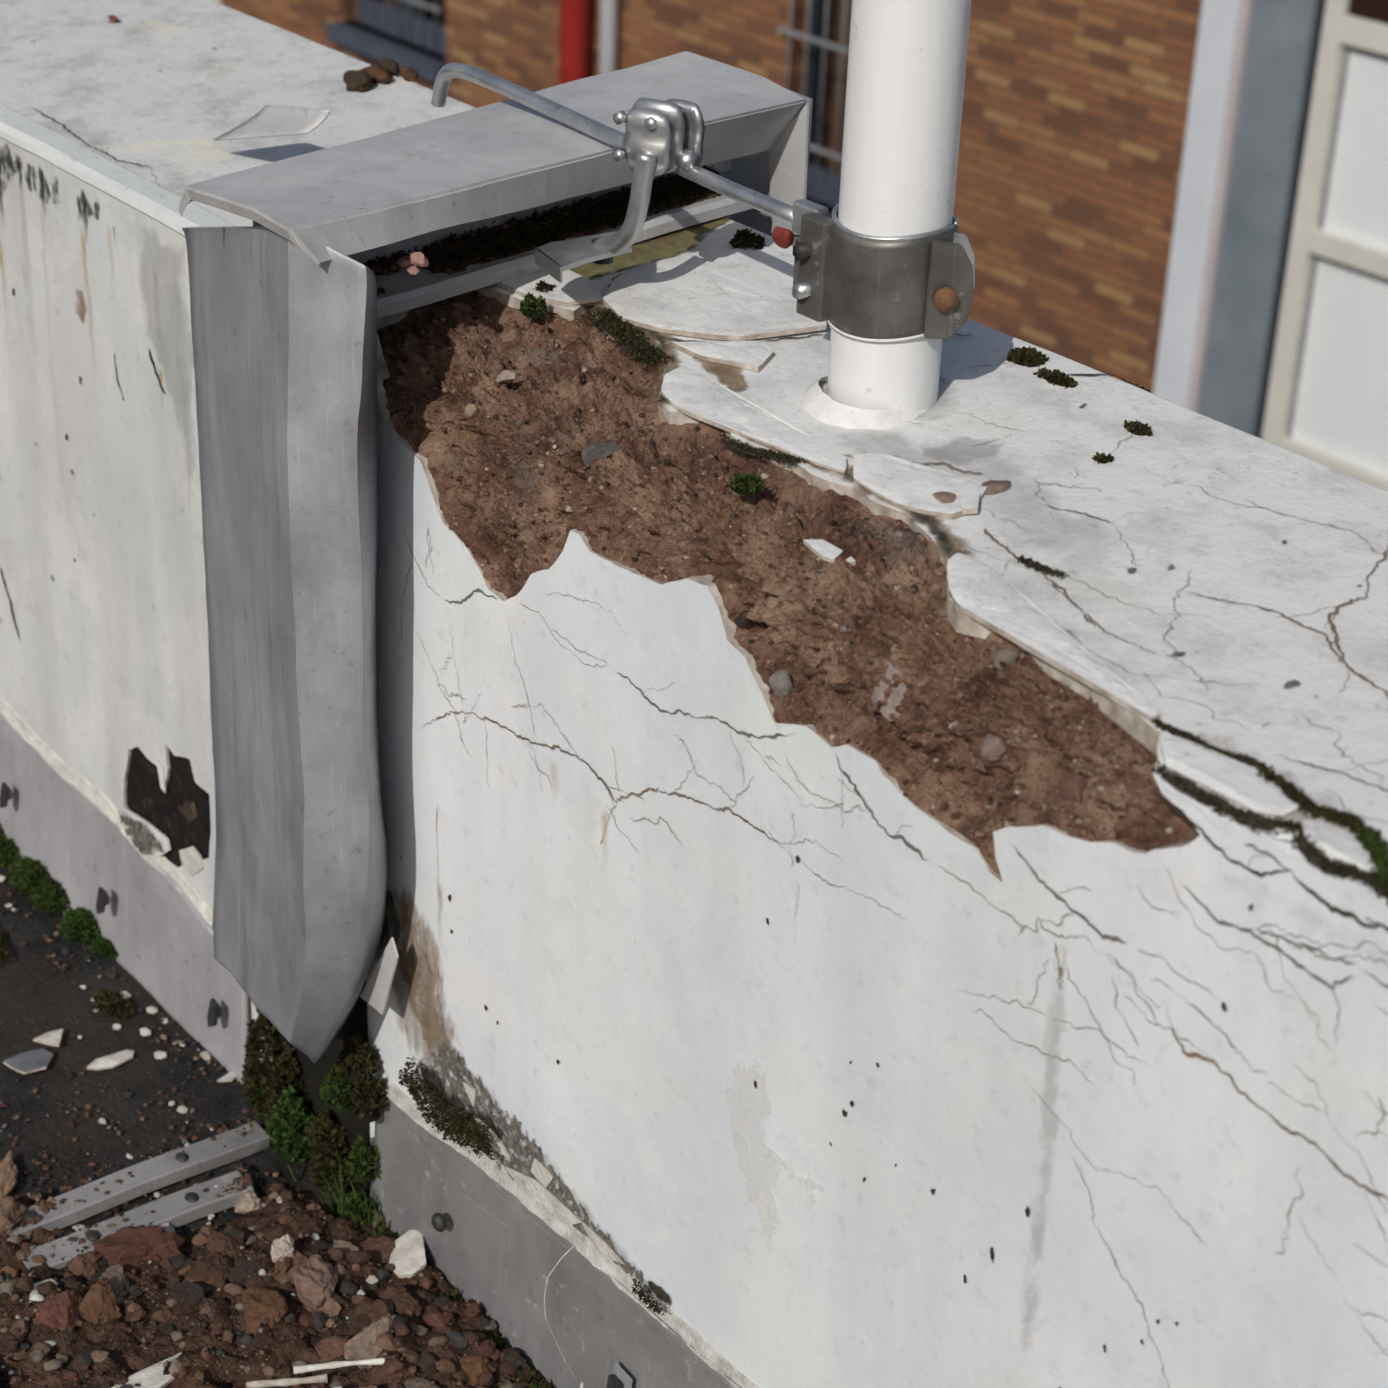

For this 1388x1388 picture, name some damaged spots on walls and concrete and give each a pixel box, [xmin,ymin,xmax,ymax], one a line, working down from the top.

water stain [0,144,57,208]
water stain [77,191,99,226]
spalling [378,246,1376,878]
crack [971,470,1388,722]
peeling [118,747,211,876]
crack [401,529,924,918]
crack [1138,793,1388,1047]
crack [1284,718,1388,820]
crack [956,849,1388,1257]
crack [1107,1246,1169,1388]